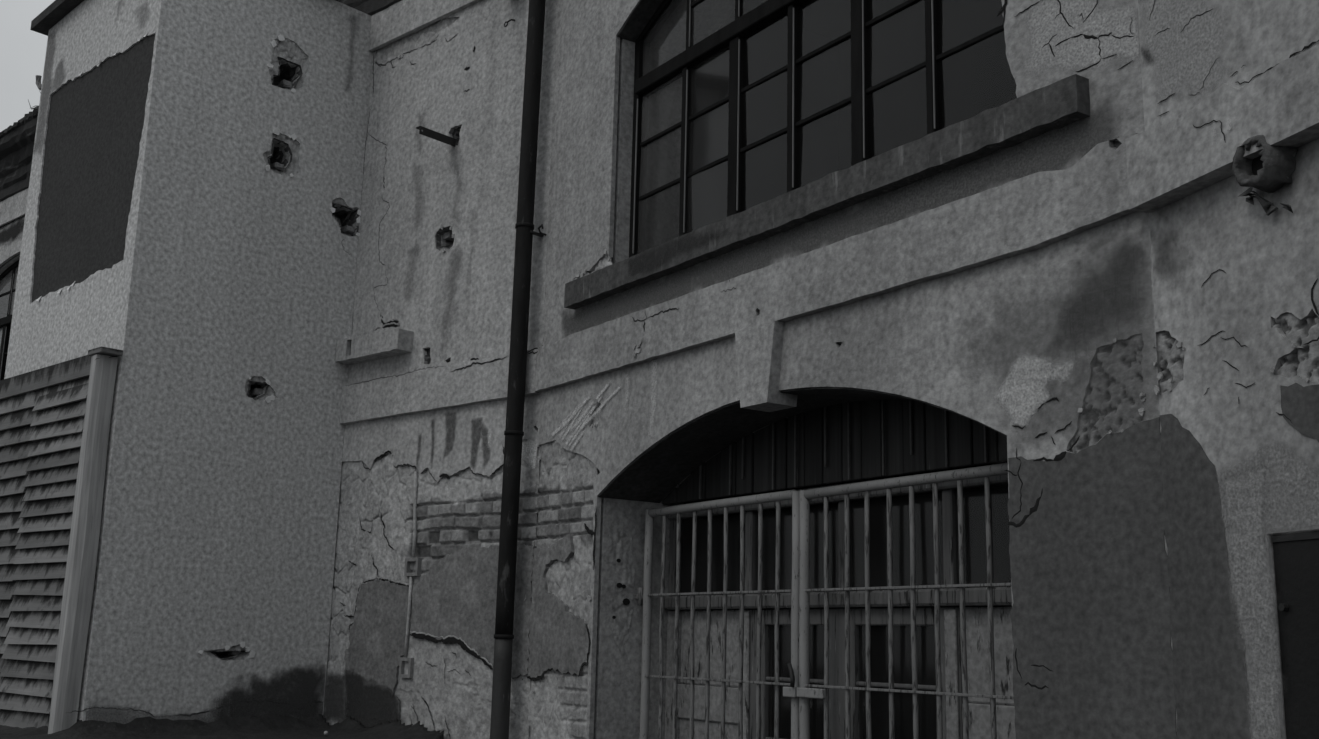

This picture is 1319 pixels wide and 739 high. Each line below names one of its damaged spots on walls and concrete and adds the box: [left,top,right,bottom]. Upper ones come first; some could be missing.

spalling [267,34,308,93]
crack [997,0,1212,72]
crack [1158,40,1319,143]
spalling [263,127,299,177]
spalling [330,194,361,237]
peeling [1070,331,1185,453]
crack [1200,331,1254,402]
peeling [1270,312,1319,383]
crack [1303,278,1319,345]
peeling [517,426,597,629]
peeling [323,452,504,739]
peeling [509,663,588,739]